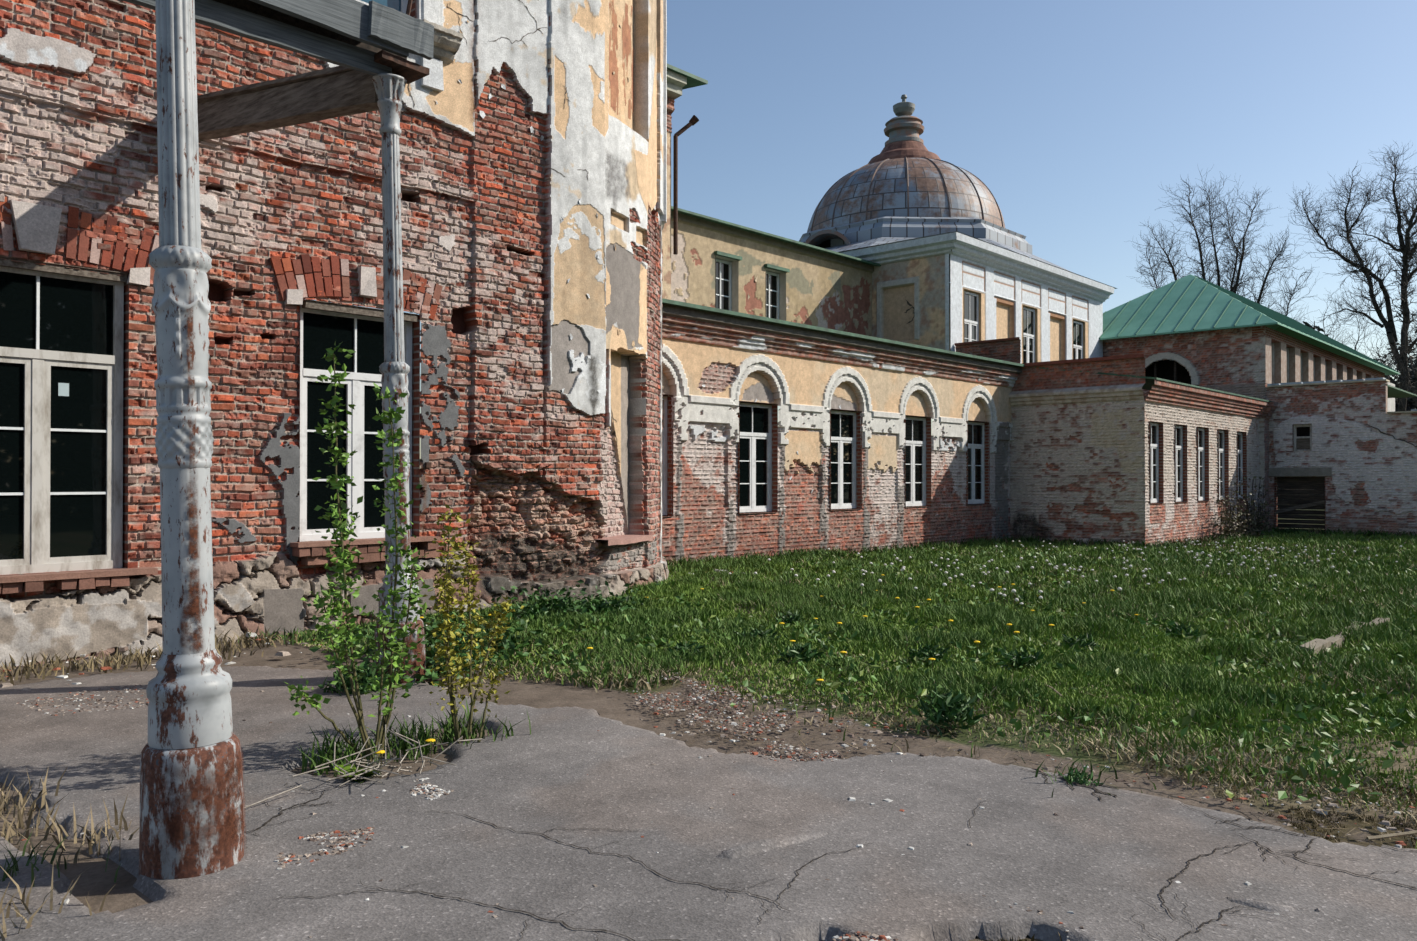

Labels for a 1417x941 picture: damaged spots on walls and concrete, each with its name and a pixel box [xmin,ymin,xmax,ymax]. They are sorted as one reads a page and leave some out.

peeling [444,0,469,34]
crack [447,0,549,48]
peeling [572,0,634,136]
rust [187,294,195,385]
flaking render [401,40,715,568]
flaking render [697,361,780,402]
flaking render [831,394,857,411]
rust [180,482,203,651]
spalling [463,442,619,602]
flaking render [680,445,728,561]
flaking render [782,451,827,553]
rust [162,763,245,852]